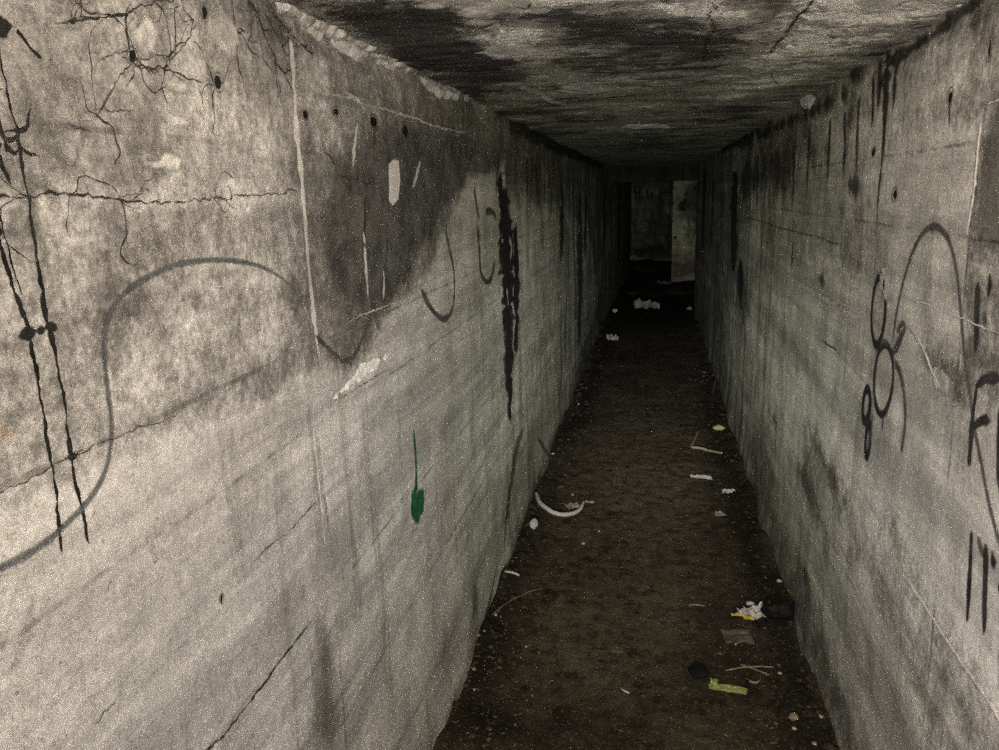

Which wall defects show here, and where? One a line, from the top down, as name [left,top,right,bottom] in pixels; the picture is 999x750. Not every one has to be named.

crack [61,0,314,161]
damp [359,4,527,98]
crack [661,0,814,85]
damp [843,98,860,197]
damp [871,50,900,226]
crack [0,171,295,265]
damp [693,120,831,300]
crack [0,410,182,494]
crack [207,628,306,750]